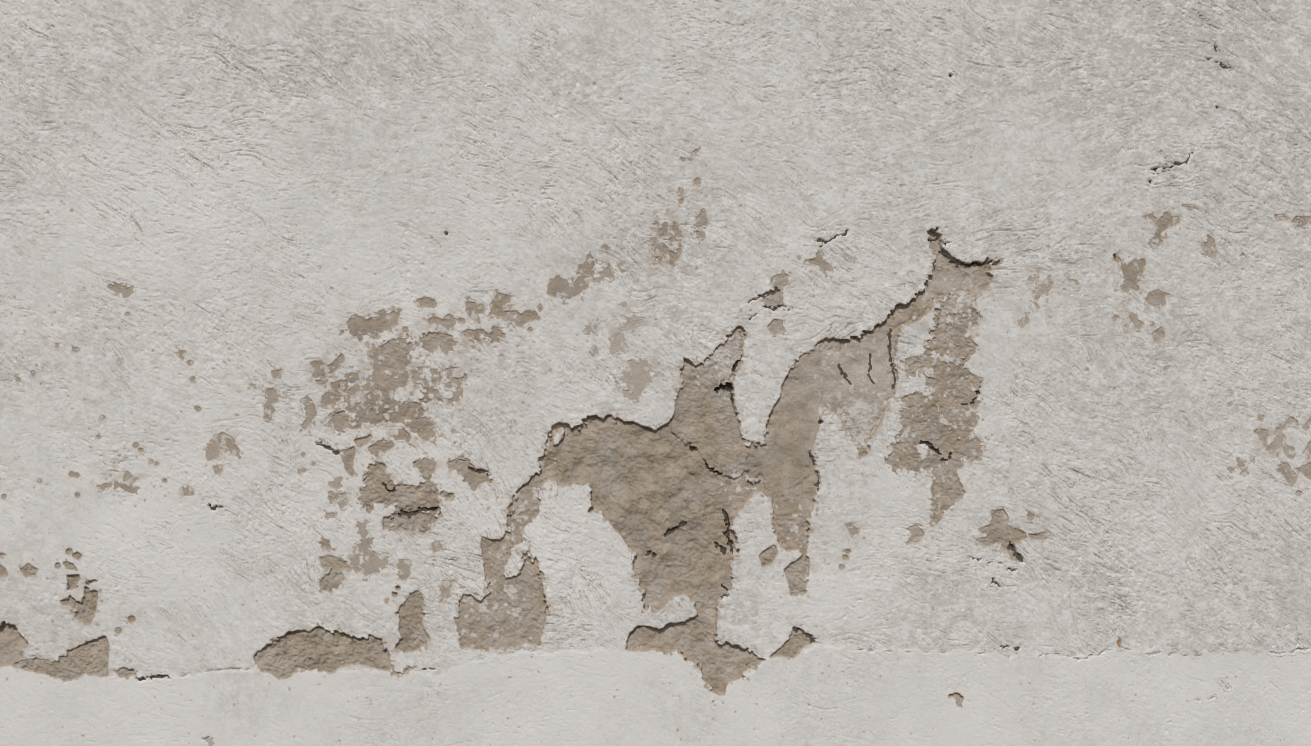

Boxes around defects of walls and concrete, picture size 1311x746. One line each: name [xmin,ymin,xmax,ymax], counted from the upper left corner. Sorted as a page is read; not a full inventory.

peeling [1112,204,1194,342]
peeling [203,431,241,473]
flaking render [254,230,1003,692]
peeling [1227,414,1311,499]
peeling [978,508,1052,564]
flaking render [0,549,138,681]
crack [793,627,817,643]
crack [1267,634,1309,657]
crack [137,668,249,681]